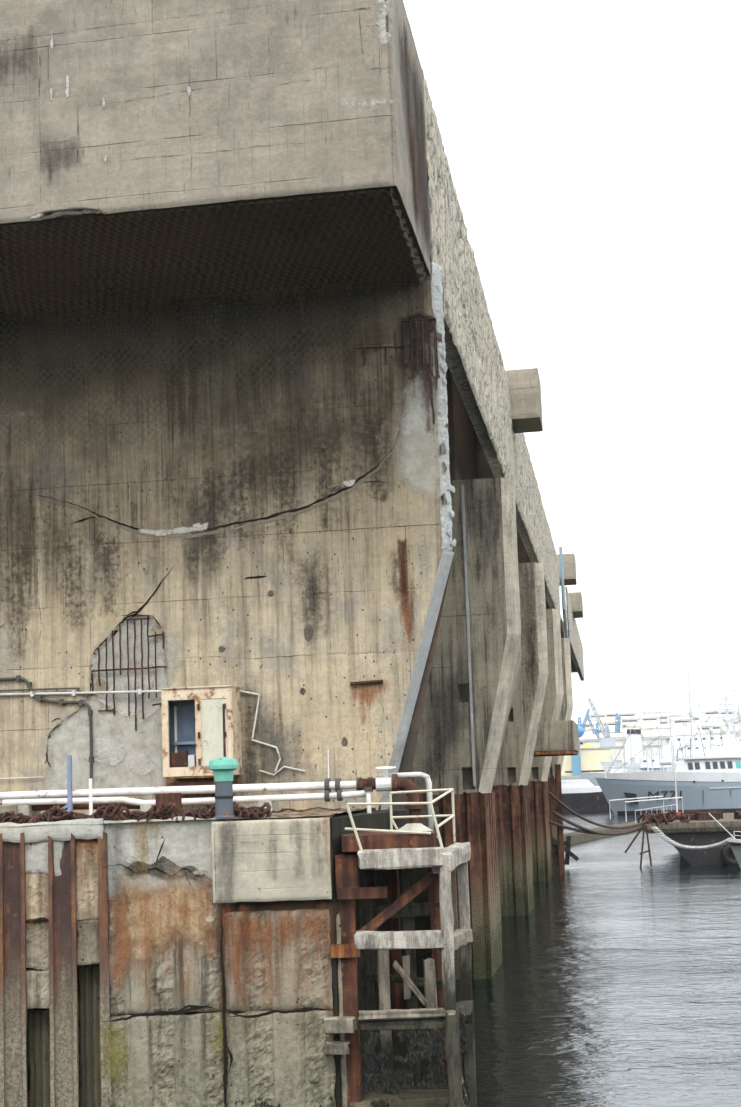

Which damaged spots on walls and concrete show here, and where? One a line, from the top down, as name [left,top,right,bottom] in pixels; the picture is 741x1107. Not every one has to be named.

spalling [376,0,393,44]
crack [38,377,409,538]
rust [393,541,411,633]
peeling [46,616,168,790]
crack [44,567,173,786]
rust [350,680,383,701]
peeling [120,856,226,974]
crack [103,839,332,1107]
rust [216,908,314,1007]